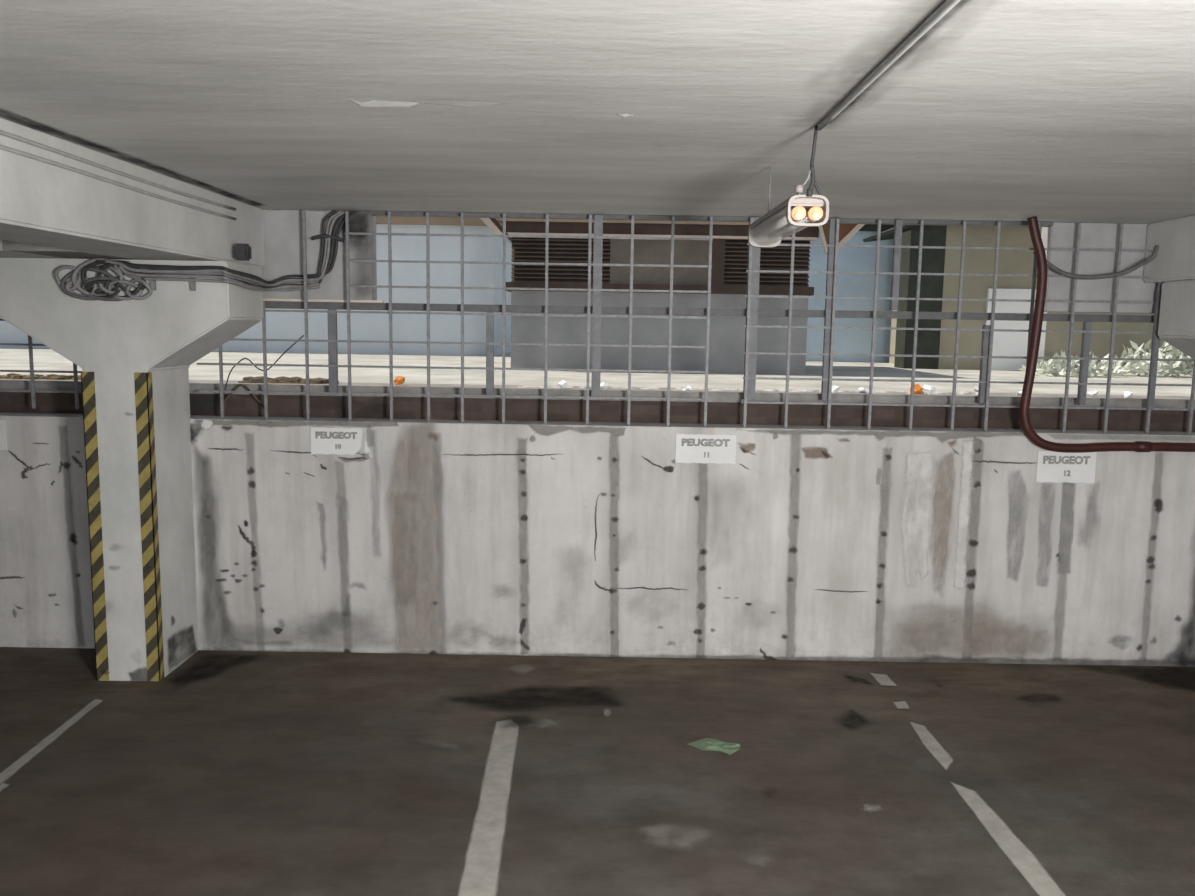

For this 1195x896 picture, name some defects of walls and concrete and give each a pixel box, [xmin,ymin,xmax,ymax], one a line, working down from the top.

crack [8,443,83,486]
water stain [390,439,440,649]
water stain [933,455,953,575]
water stain [1008,484,1024,579]
water stain [1040,483,1075,585]
water stain [1169,578,1195,665]